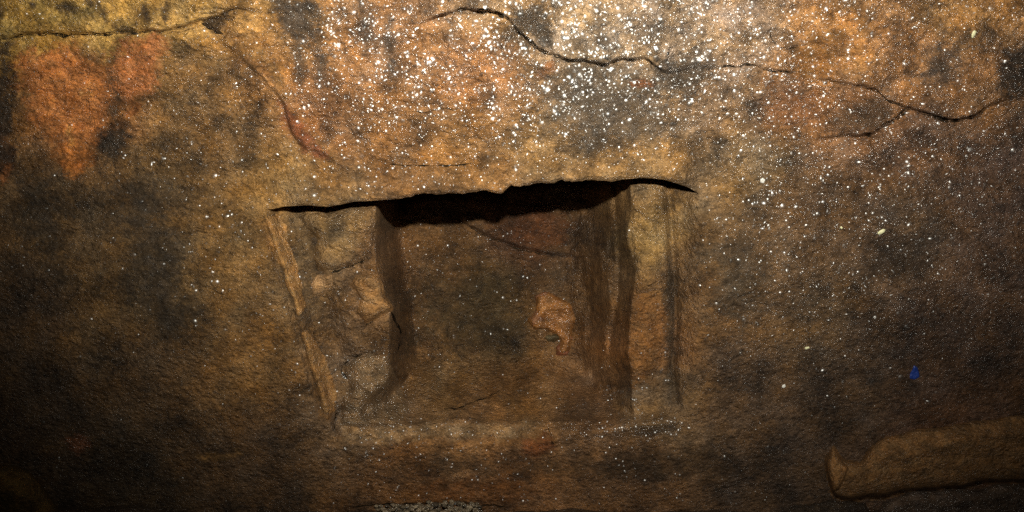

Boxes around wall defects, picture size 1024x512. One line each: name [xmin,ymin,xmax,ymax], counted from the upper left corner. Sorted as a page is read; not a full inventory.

crack [0,8,244,40]
crack [419,8,1003,140]